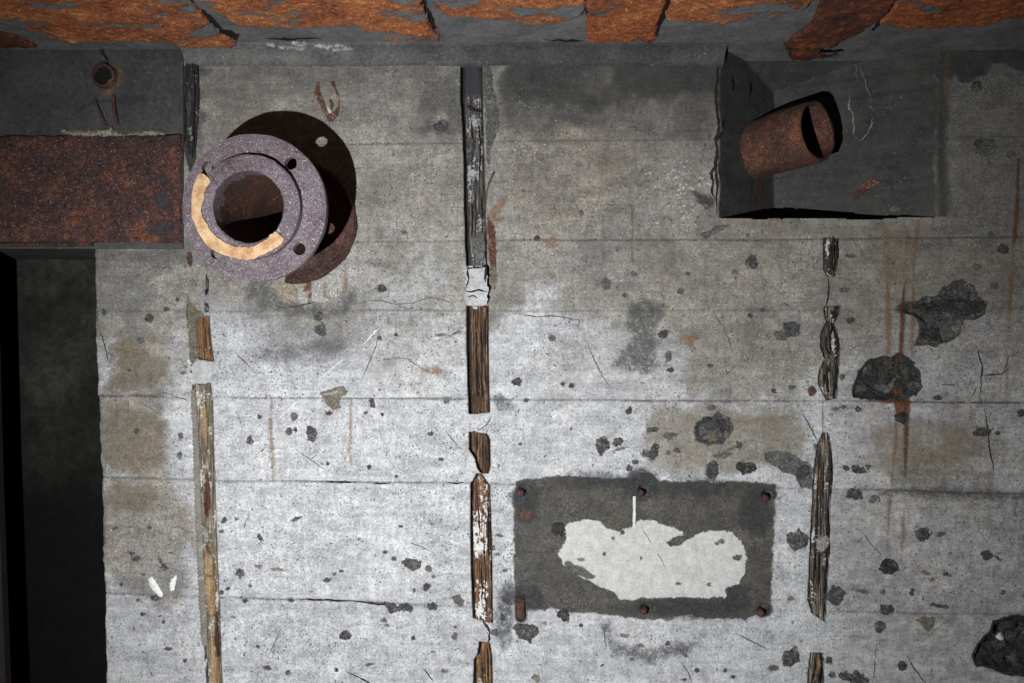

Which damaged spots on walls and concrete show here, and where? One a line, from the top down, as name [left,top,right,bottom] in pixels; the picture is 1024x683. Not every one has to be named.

corrosion [885,233,917,365]
spalling [896,280,987,347]
leakage [104,407,168,472]
spalling [833,352,922,424]
corrosion [869,399,910,474]
crack [943,345,1013,473]
peeling [490,405,813,644]
spalling [972,614,1024,677]